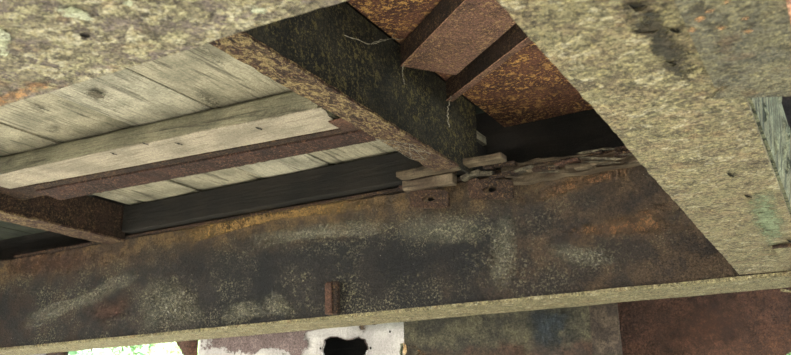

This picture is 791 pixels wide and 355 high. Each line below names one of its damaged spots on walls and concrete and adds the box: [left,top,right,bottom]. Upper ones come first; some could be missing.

rust [173,200,379,242]
rust [404,306,593,355]